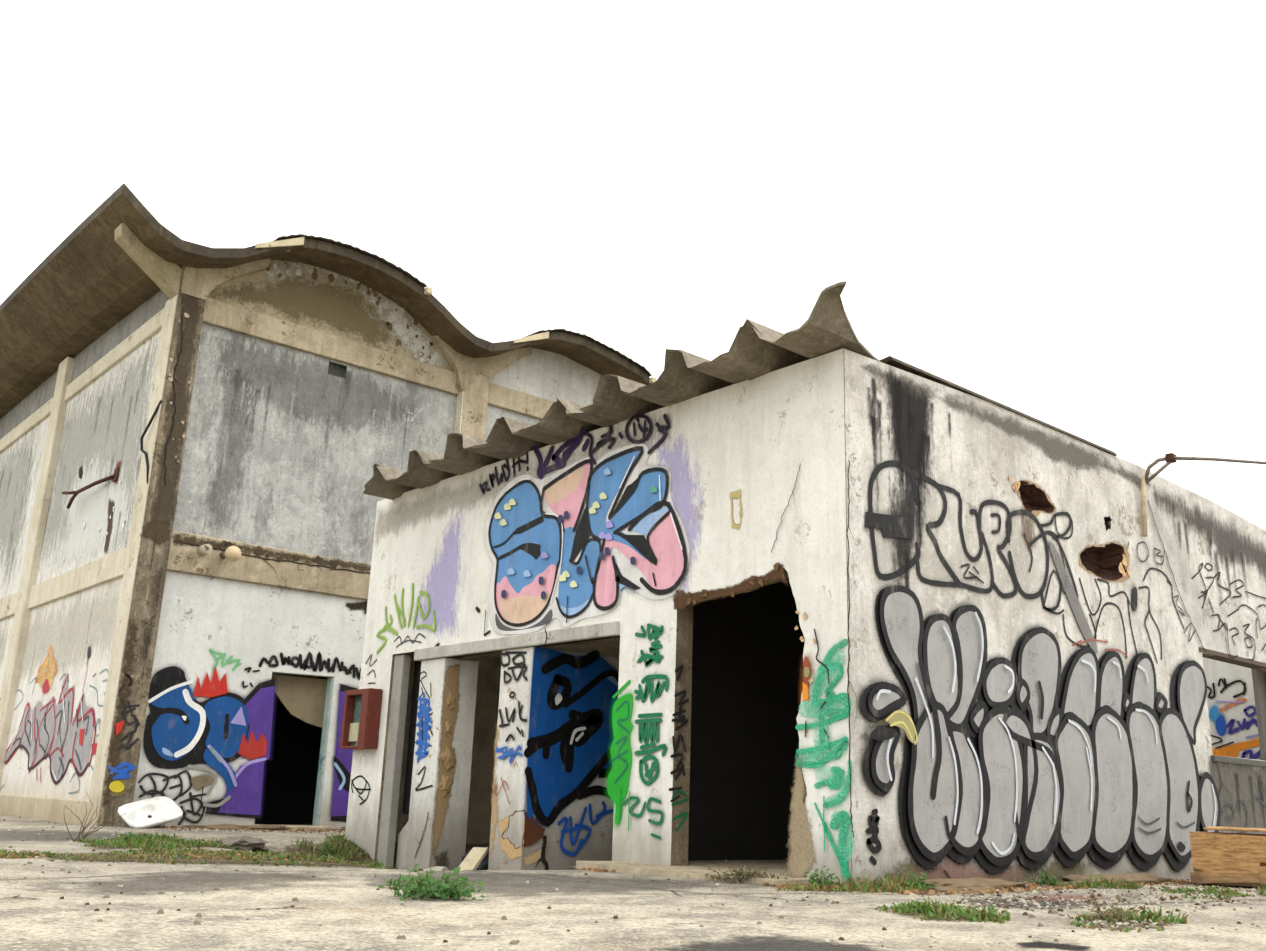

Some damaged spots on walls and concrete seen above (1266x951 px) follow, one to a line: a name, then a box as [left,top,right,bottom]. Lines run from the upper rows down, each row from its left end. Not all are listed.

damp [140,277,391,658]
spalling [1009,477,1056,547]
damp [864,366,1266,588]
spalling [1079,517,1130,582]
spalling [673,562,787,611]